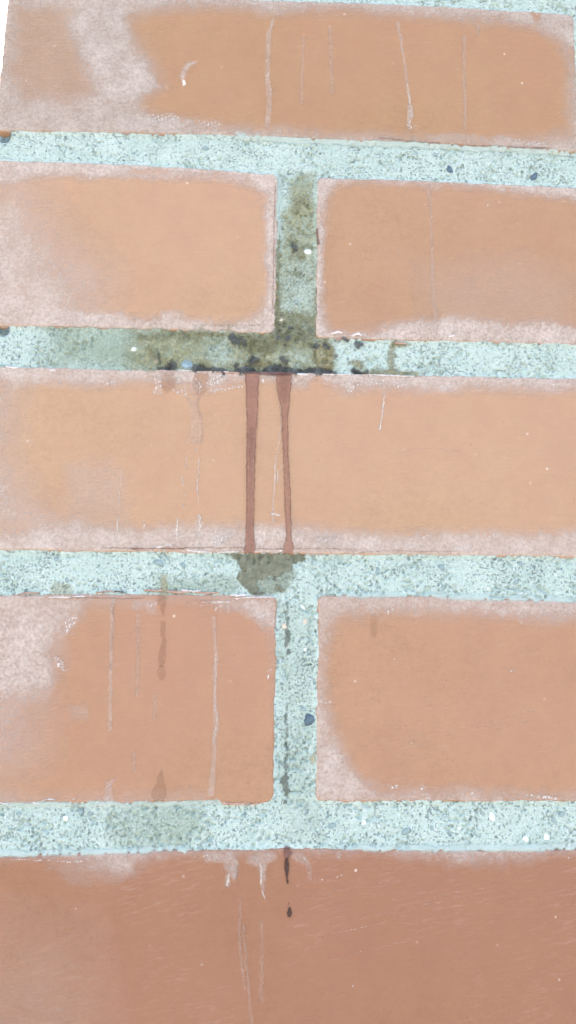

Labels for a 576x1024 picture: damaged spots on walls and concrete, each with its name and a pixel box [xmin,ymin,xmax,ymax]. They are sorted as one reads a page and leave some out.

water stain [0,161,576,654]
water stain [0,595,83,702]
water stain [280,707,289,804]
water stain [316,691,424,802]